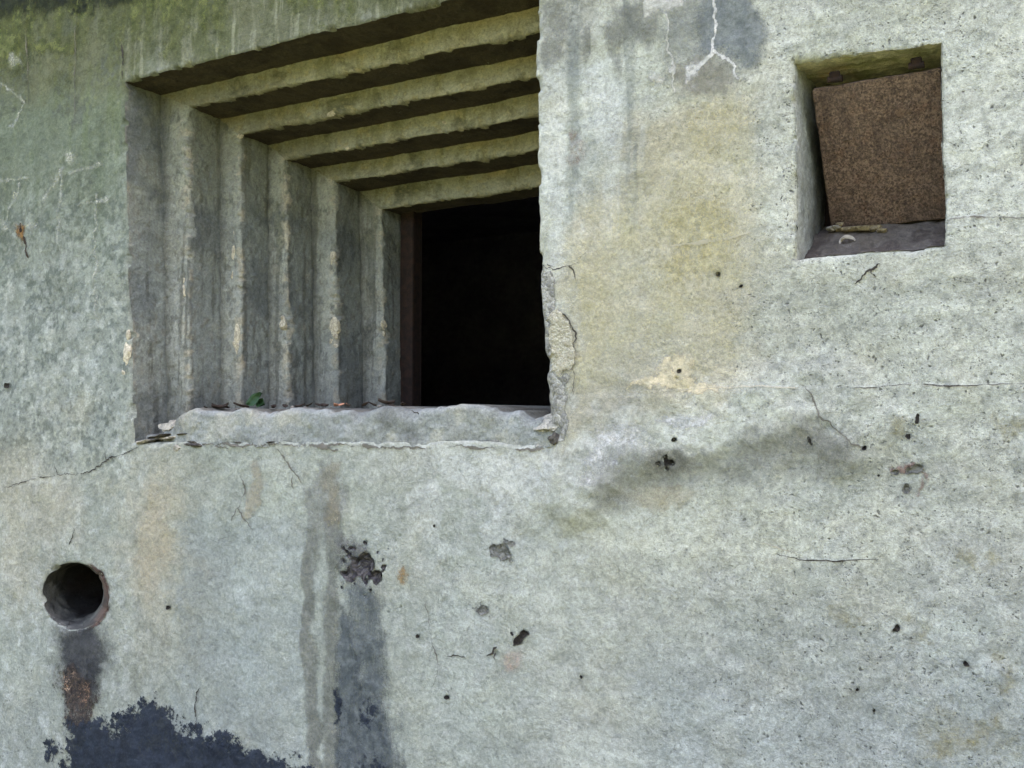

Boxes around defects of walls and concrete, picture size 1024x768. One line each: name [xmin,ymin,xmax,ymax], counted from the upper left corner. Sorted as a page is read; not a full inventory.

damp [607,0,765,93]
rust [16,223,28,258]
spalling [541,265,577,443]
peeling [670,353,694,379]
crack [805,387,863,448]
crack [7,444,142,488]
spalling [337,540,389,591]
spalling [489,538,515,562]
damp [300,468,405,768]
spalling [510,627,529,646]
rust [52,665,100,728]